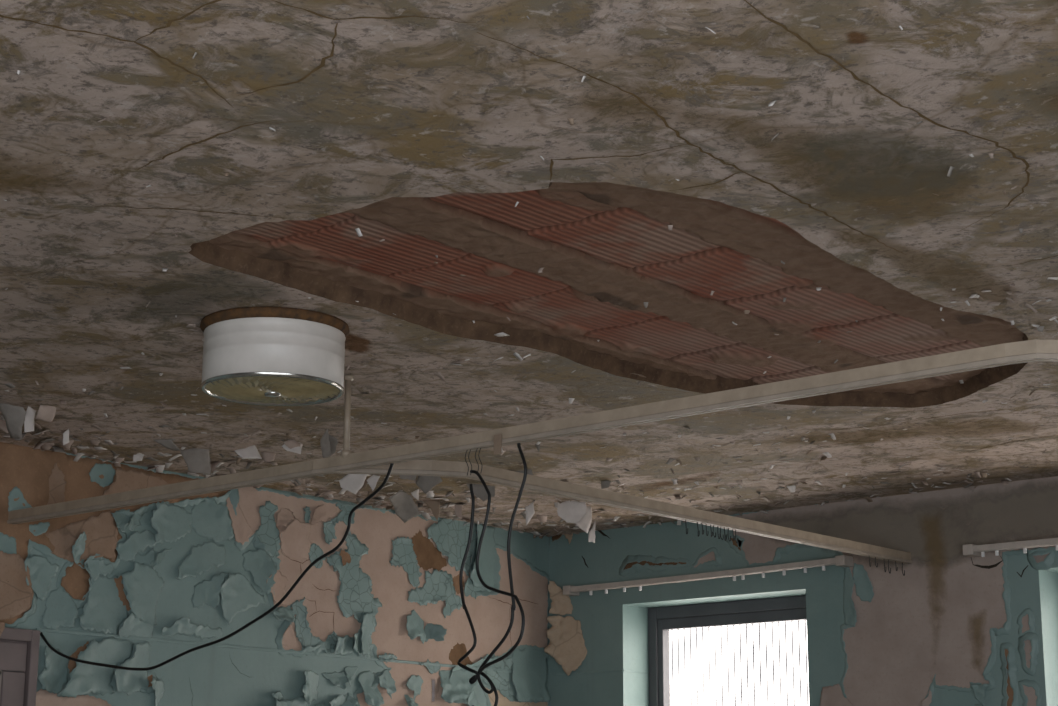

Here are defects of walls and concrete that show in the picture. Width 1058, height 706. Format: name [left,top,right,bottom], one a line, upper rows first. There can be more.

crack [0,0,906,255]
crack [744,0,1030,231]
rust [345,334,370,353]
spalling [188,241,766,394]
peeling [940,284,1058,341]
peeling [601,362,1058,522]
peeling [619,530,810,577]
peeling [820,535,1058,706]